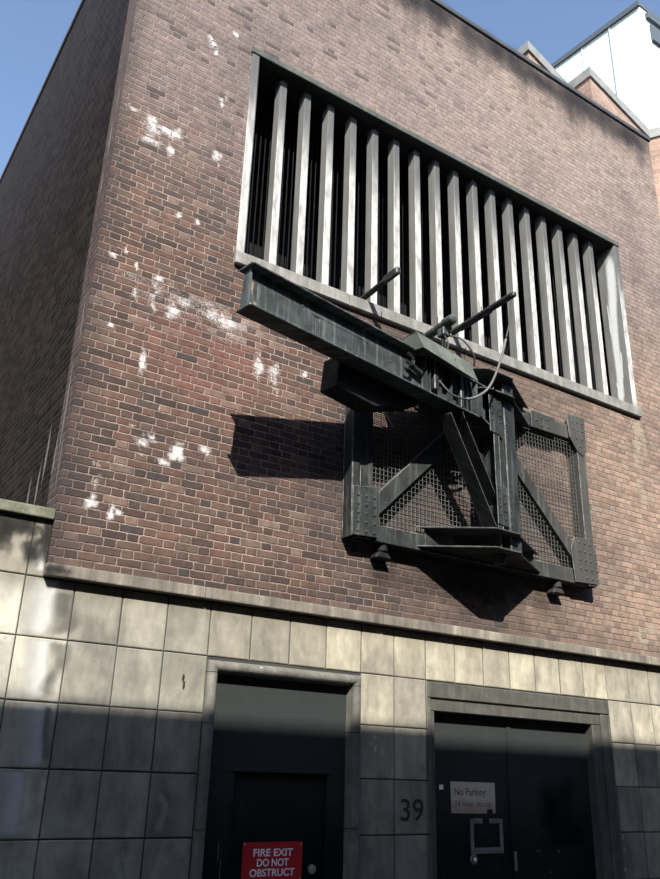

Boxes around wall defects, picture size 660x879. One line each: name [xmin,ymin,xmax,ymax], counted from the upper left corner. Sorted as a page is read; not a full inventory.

leakage [141,115,183,158]
leakage [112,264,281,394]
leakage [157,441,185,466]
leakage [84,463,100,510]